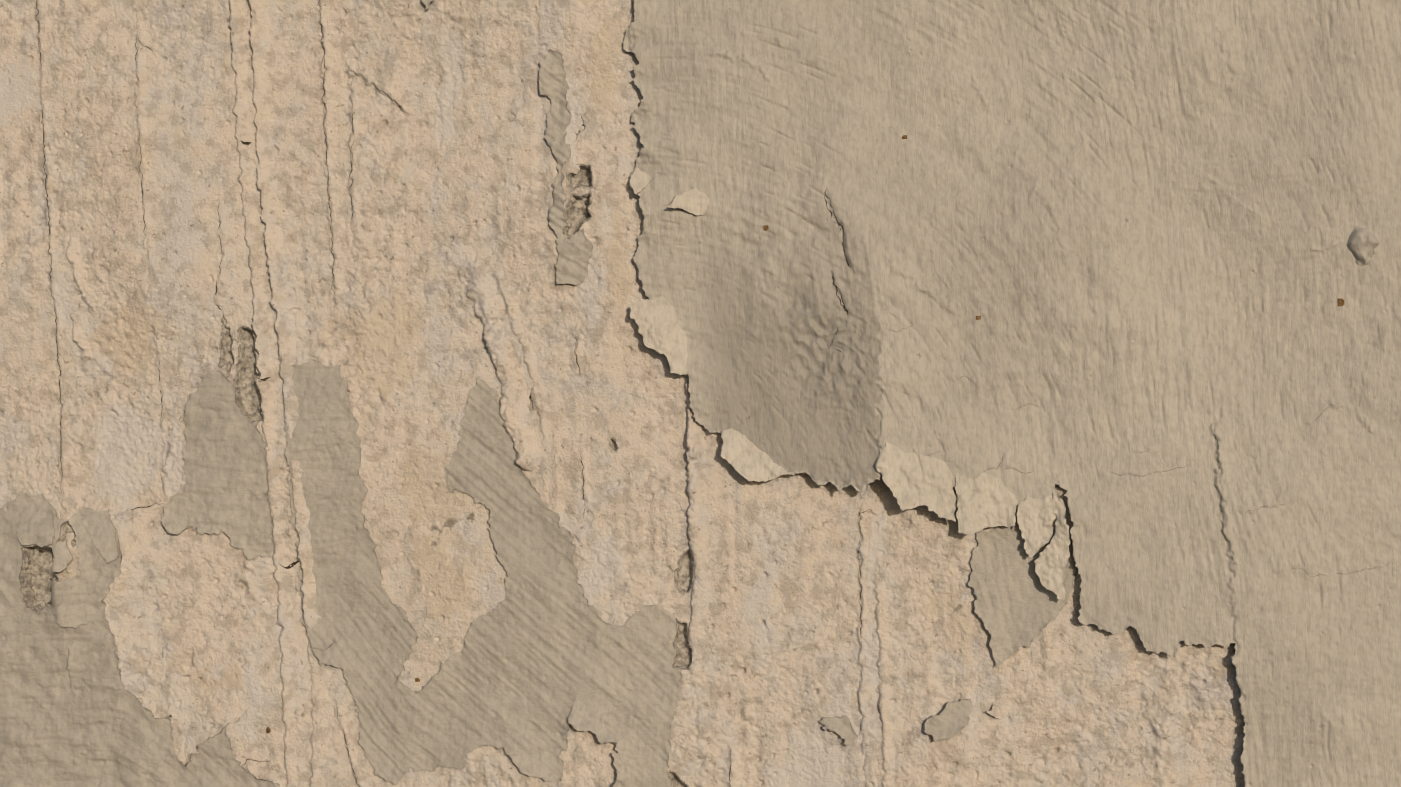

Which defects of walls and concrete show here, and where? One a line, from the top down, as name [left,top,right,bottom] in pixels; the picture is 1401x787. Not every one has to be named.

crack [318,2,403,299]
peeling [539,49,593,285]
peeling [0,491,280,787]
peeling [161,316,274,560]
peeling [284,359,697,787]
peeling [623,0,1401,787]